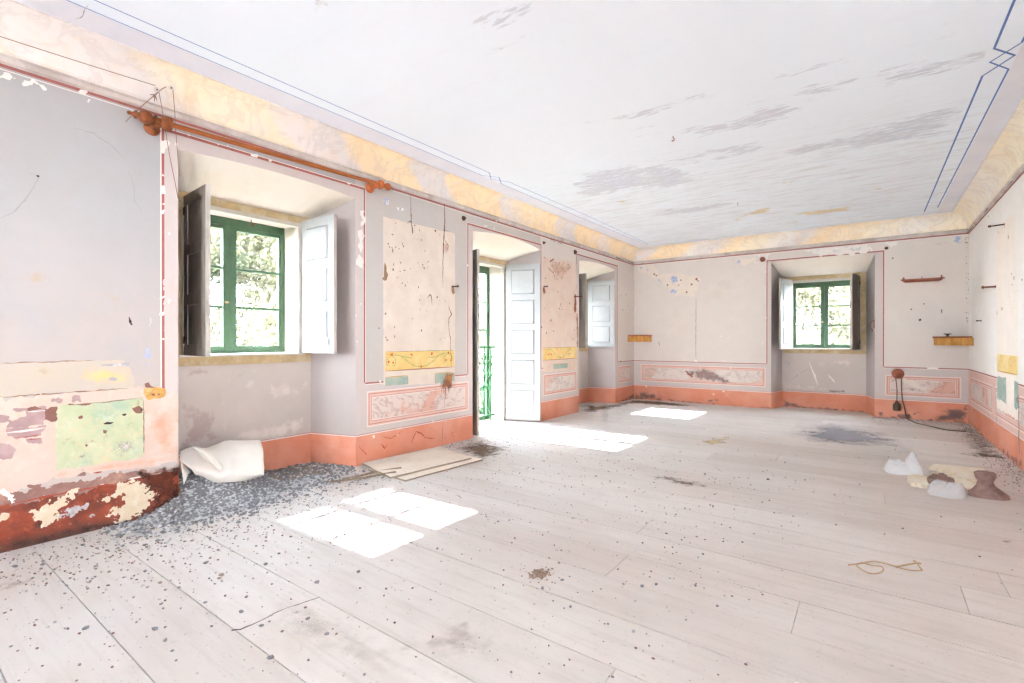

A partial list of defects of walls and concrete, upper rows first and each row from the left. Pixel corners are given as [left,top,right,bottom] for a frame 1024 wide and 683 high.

peeling [0,72,47,91]
crack [427,204,452,367]
flaking render [0,362,178,528]
corrosion [441,374,453,410]